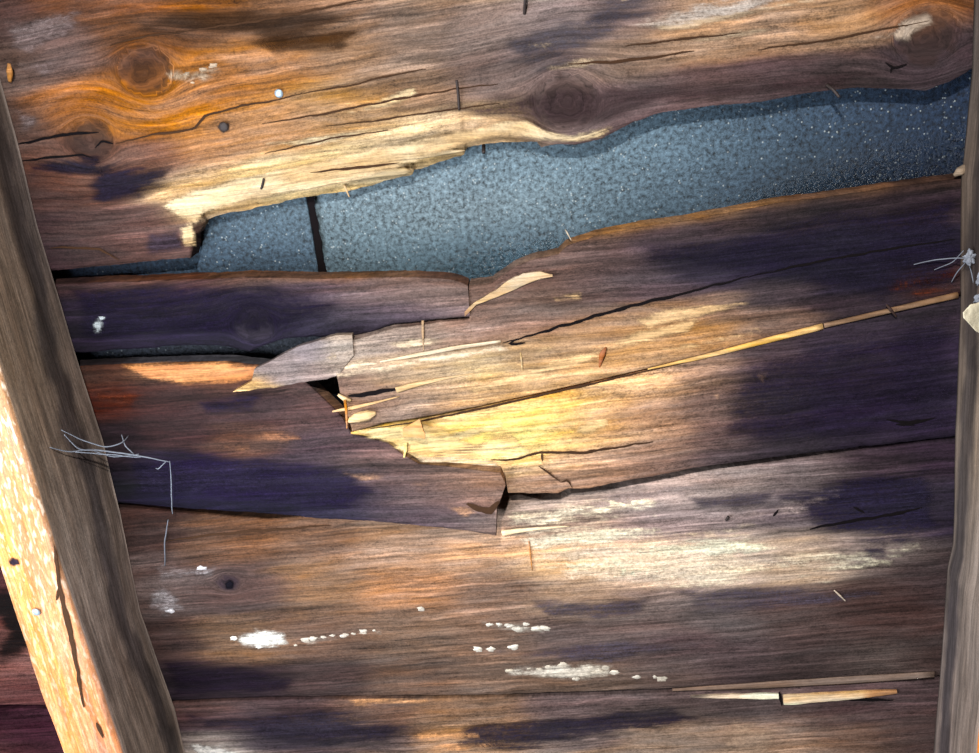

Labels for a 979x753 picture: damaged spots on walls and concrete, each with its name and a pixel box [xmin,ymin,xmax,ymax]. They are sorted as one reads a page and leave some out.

damp [161,12,355,52]
crack [18,69,498,161]
crack [310,163,397,173]
peeling [165,121,606,245]
crack [503,239,955,345]
peeling [338,346,506,376]
peeling [470,303,743,394]
peeling [359,420,539,466]
damp [230,629,376,649]
damp [486,622,551,632]
damp [505,642,656,681]
damp [458,709,691,750]